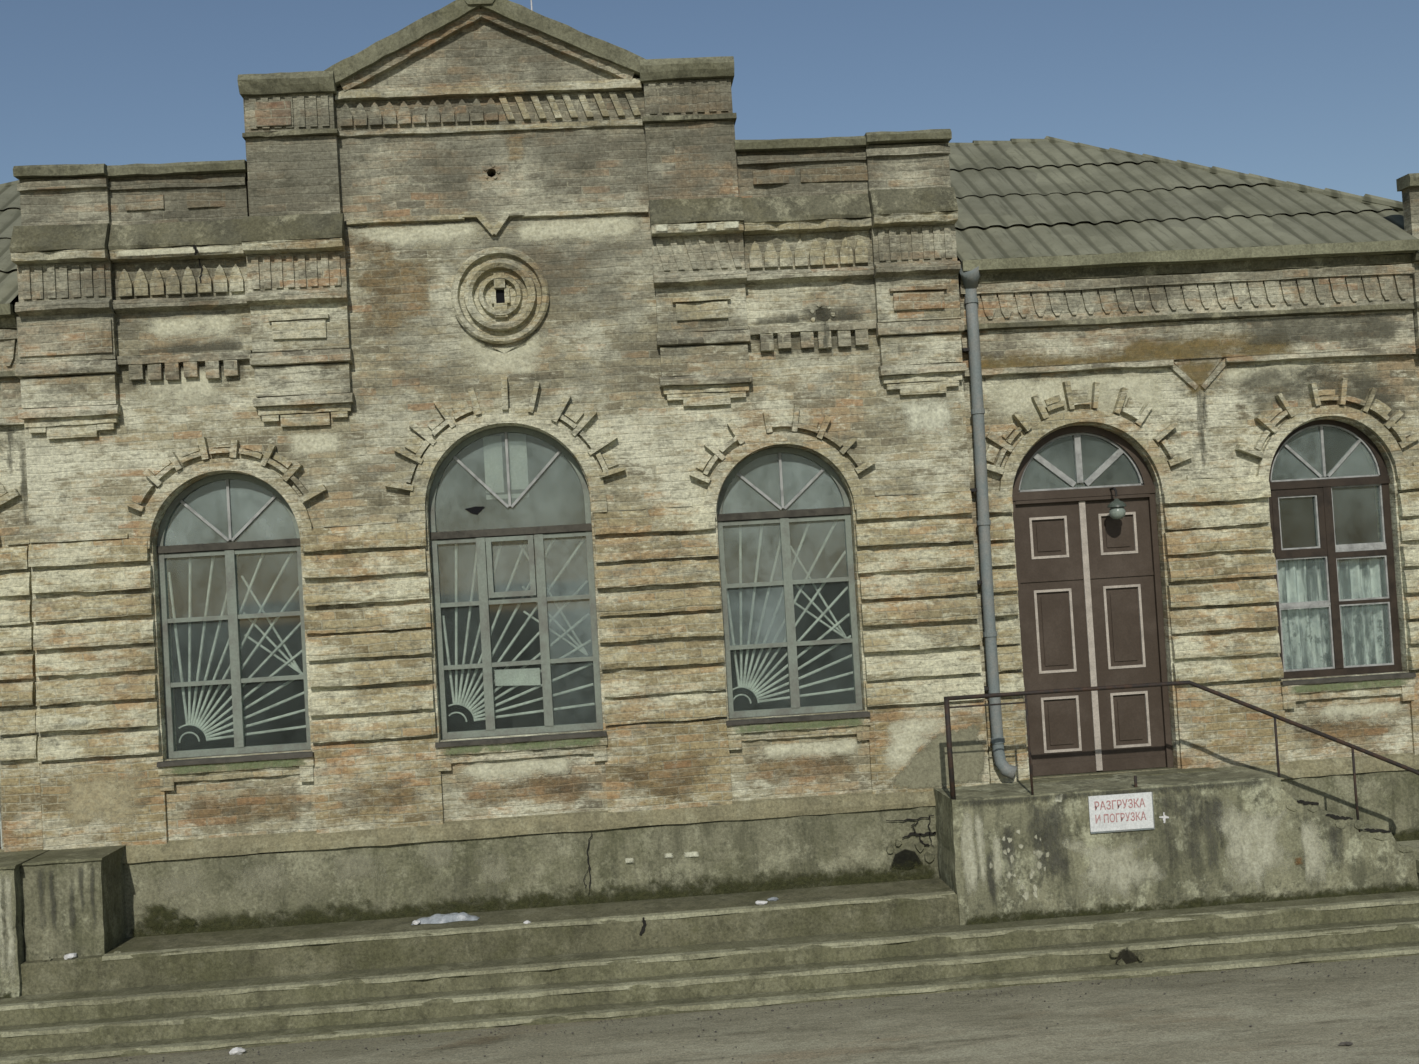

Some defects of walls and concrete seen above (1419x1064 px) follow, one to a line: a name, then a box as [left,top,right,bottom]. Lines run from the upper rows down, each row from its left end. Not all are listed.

water stain [961,804,1163,900]